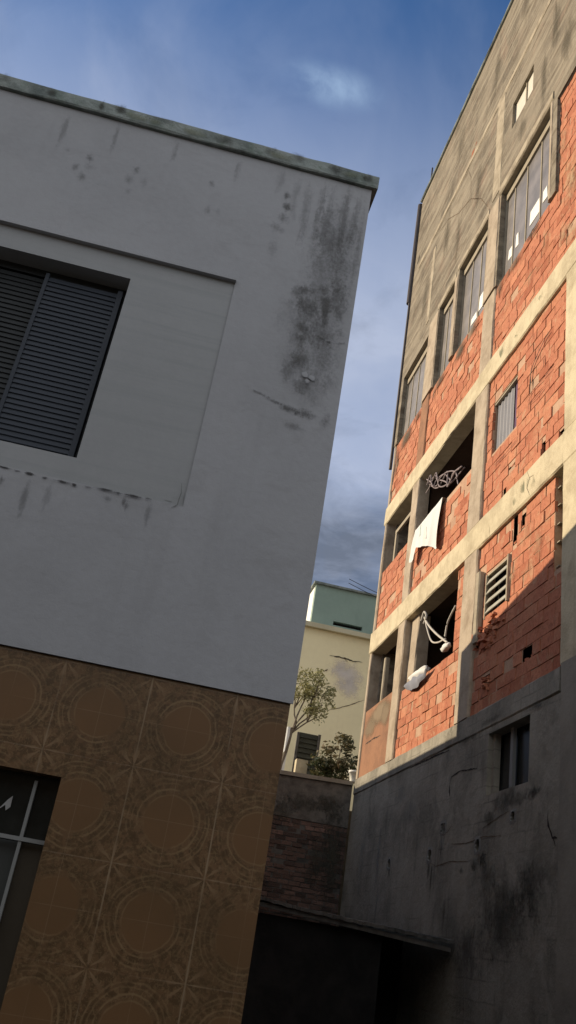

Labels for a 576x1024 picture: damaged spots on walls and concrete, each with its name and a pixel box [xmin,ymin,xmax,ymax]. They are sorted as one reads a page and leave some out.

crack [410,750,477,796]